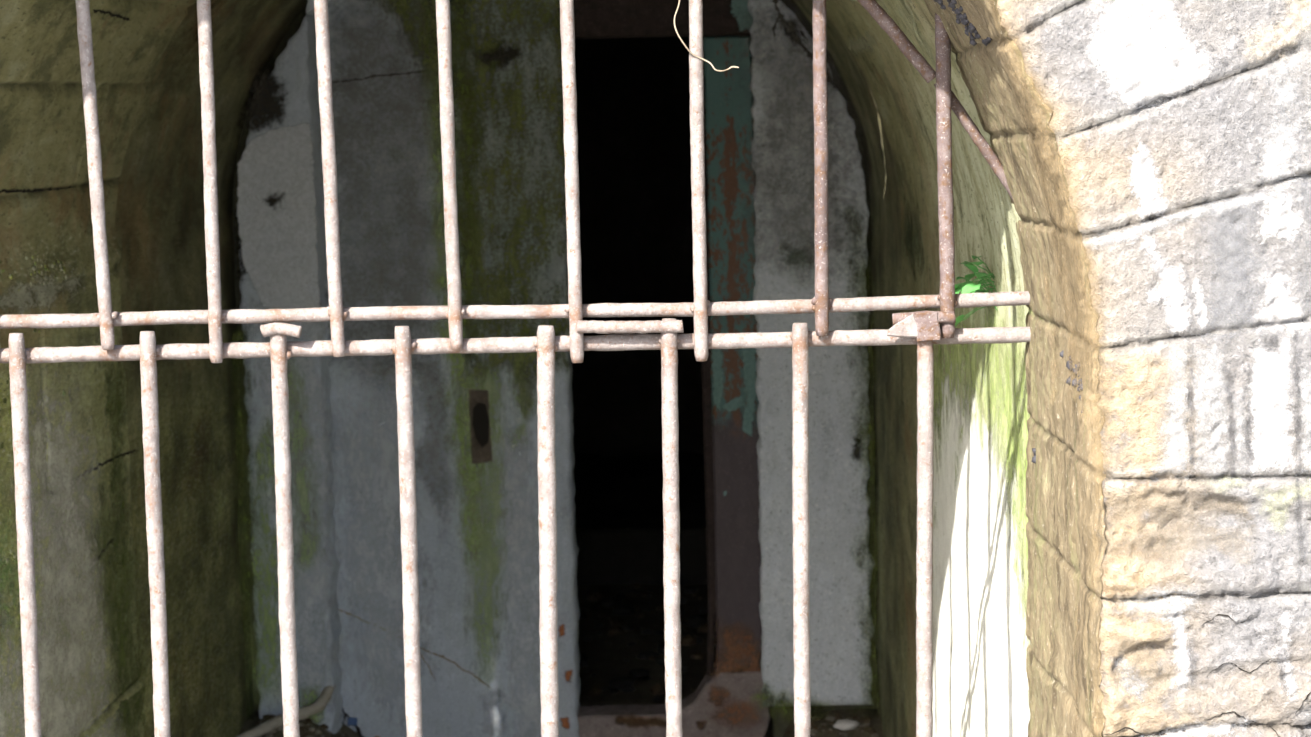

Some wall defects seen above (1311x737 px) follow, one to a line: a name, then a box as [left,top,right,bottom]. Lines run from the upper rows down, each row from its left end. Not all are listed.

leakage [1086,0,1311,333]
leakage [332,0,541,736]
leakage [1154,266,1311,551]
leakage [28,389,118,737]
leakage [0,620,25,737]
rust [615,716,666,727]
rust [696,623,761,733]
crack [1106,692,1311,737]
crack [1209,659,1277,674]
leakage [1273,610,1297,701]